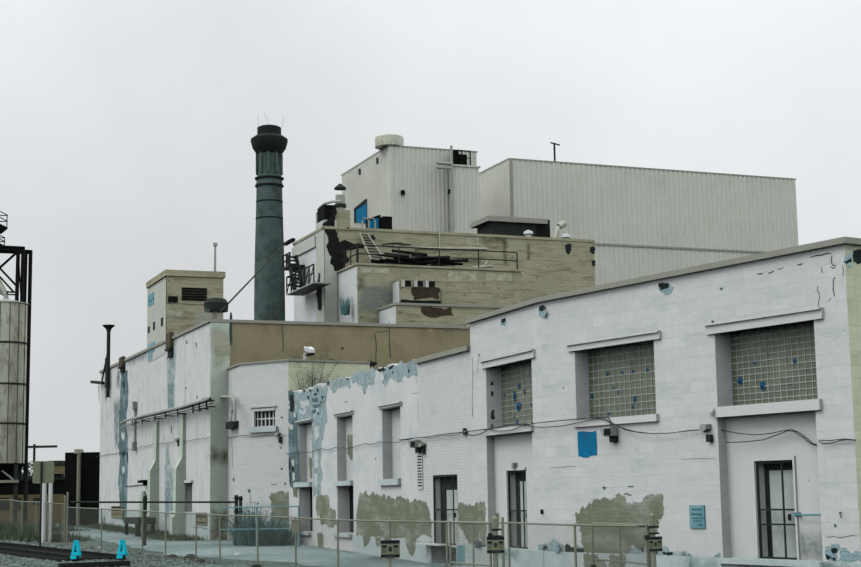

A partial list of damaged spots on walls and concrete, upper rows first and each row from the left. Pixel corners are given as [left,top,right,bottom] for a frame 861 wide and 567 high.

crack [810,253,844,307]
spalling [280,360,418,496]
spalling [629,546,691,557]
spalling [825,544,861,563]